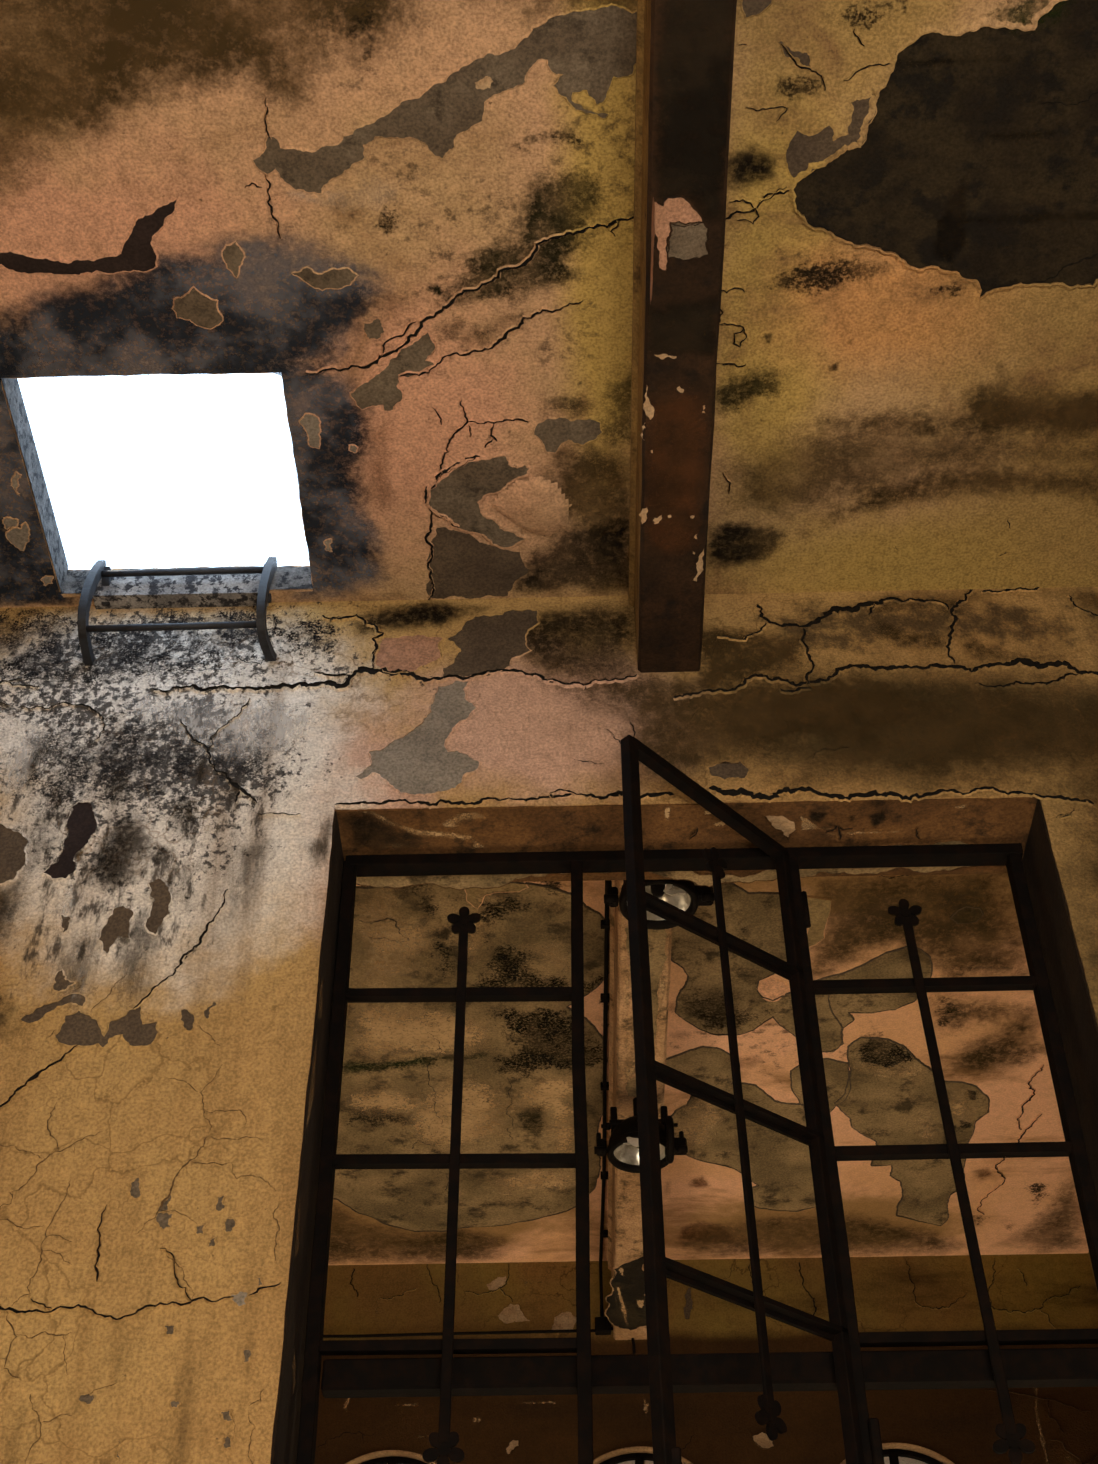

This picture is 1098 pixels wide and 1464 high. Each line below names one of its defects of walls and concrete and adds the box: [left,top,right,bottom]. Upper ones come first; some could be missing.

peeling [0,195,179,276]
peeling [251,3,637,195]
peeling [784,0,1098,301]
crack [305,213,634,600]
mould [717,374,778,409]
leakage [0,606,339,885]
crack [124,614,674,817]
peeling [354,451,540,797]
leakage [708,523,781,567]
crack [672,520,1098,701]
leakage [0,890,17,937]
crack [0,1025,282,1464]